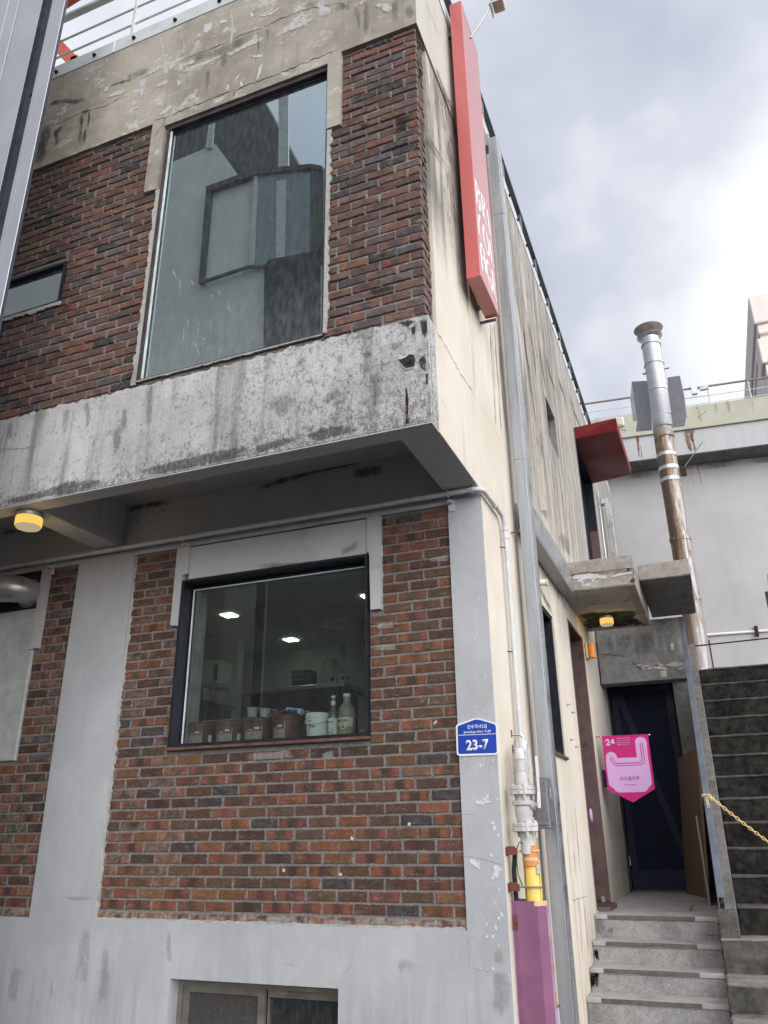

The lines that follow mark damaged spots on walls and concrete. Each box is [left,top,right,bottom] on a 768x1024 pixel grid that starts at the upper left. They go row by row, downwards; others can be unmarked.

crack [156,1,373,134]
spalling [398,353,415,371]
leakage [308,426,357,440]
leakage [146,438,293,473]
leakage [7,480,100,503]
peeling [572,568,635,586]